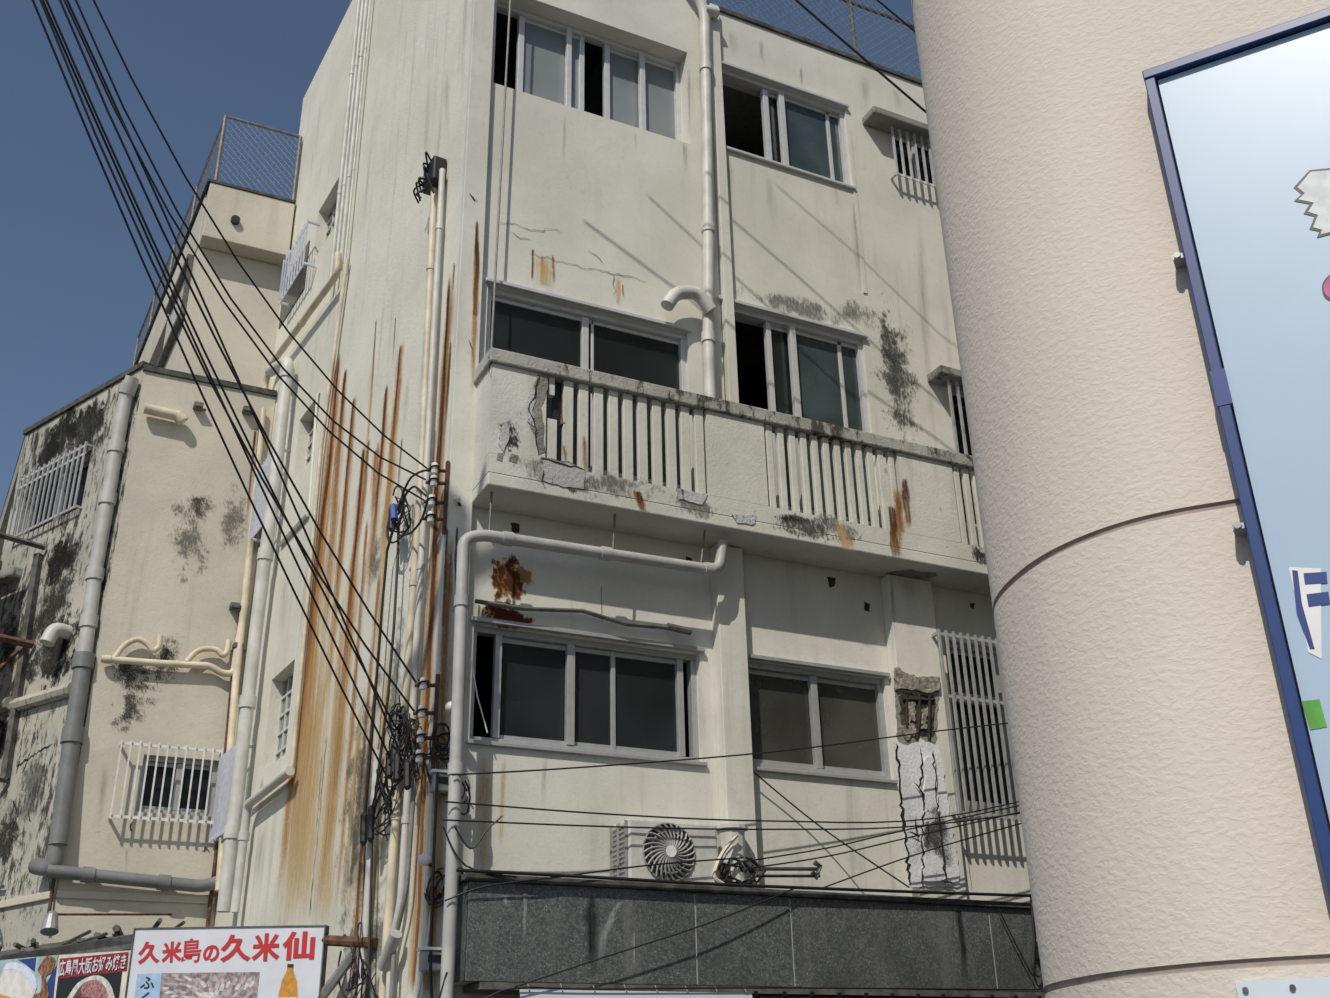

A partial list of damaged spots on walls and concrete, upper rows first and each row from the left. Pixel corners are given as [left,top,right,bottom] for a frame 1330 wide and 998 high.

crack [499,222,645,297]
water stain [22,389,110,519]
peeling [497,422,518,463]
peeling [526,374,585,489]
corrosion [890,480,911,552]
water stain [0,533,80,690]
water stain [110,635,182,733]
corrosion [281,318,402,997]
corrosion [408,265,458,988]
corrosion [480,556,534,630]
spalling [893,667,940,885]
crack [908,748,956,886]